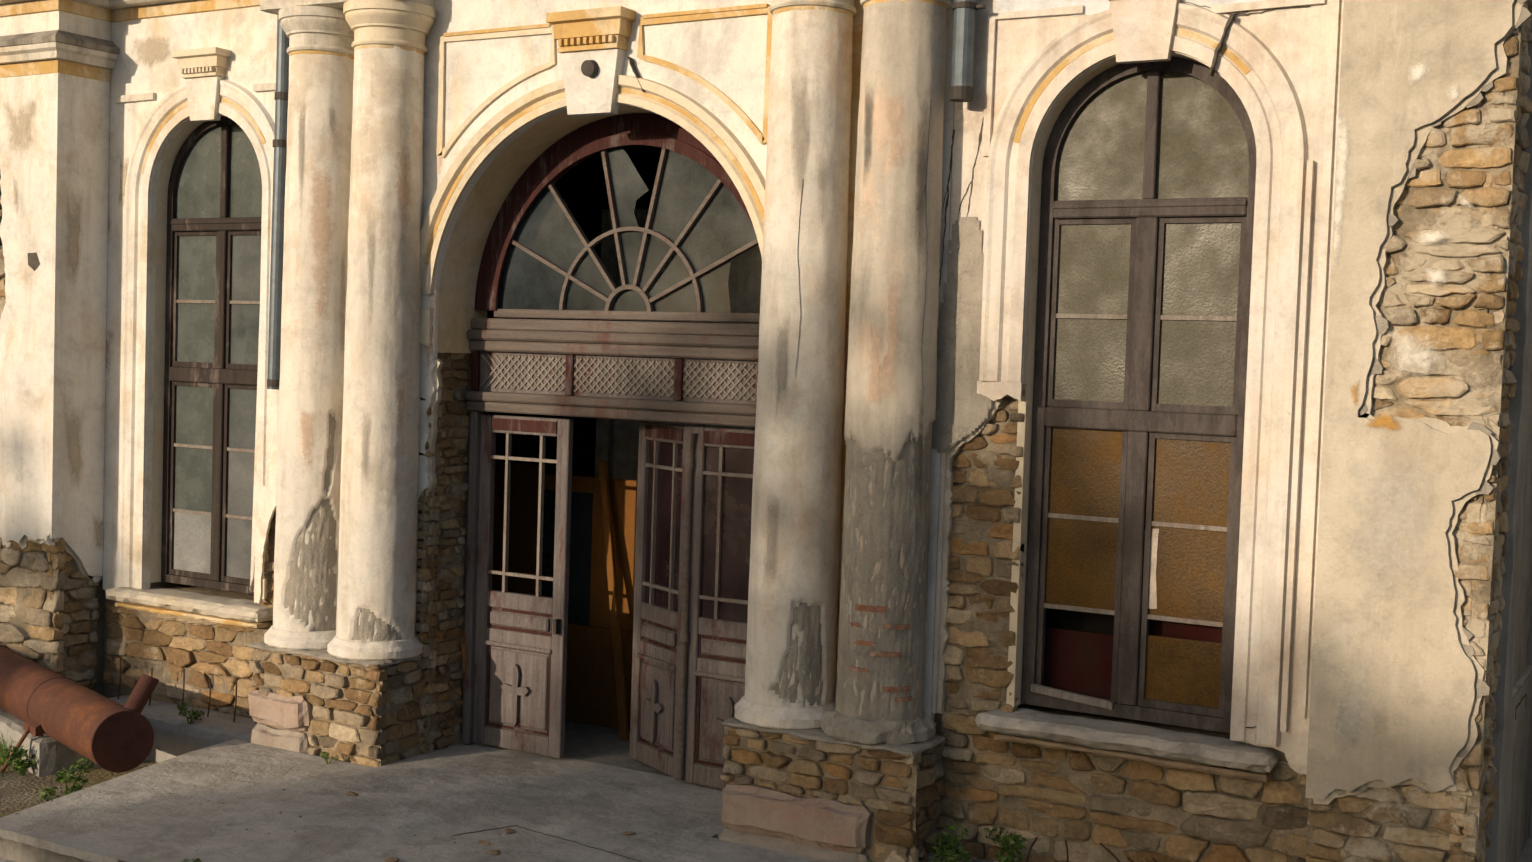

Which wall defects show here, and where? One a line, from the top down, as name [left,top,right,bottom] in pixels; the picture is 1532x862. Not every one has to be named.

crack [1183,2,1311,77]
peeling [313,182,329,250]
peeling [397,159,409,218]
flaking render [771,0,1532,862]
flaking render [0,352,470,754]